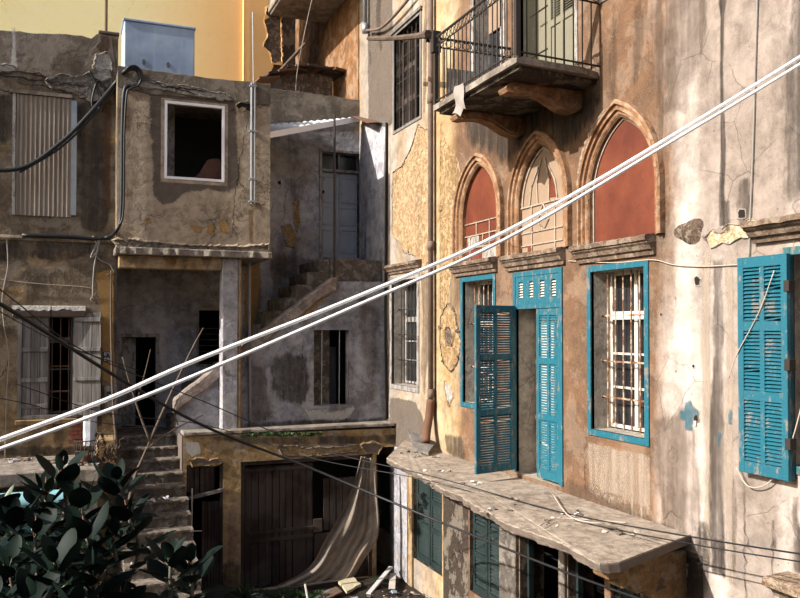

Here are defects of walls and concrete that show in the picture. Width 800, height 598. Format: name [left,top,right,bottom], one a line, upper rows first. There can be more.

spalling [262,5,284,66]
spalling [45,51,114,103]
spalling [135,79,254,114]
water stain [719,0,729,231]
water stain [788,0,800,190]
crack [197,105,276,243]
spalling [111,218,271,252]
peeling [244,263,261,337]
spalling [281,198,301,249]
spalling [299,294,331,326]
spalling [391,119,462,407]
water stain [686,253,734,598]